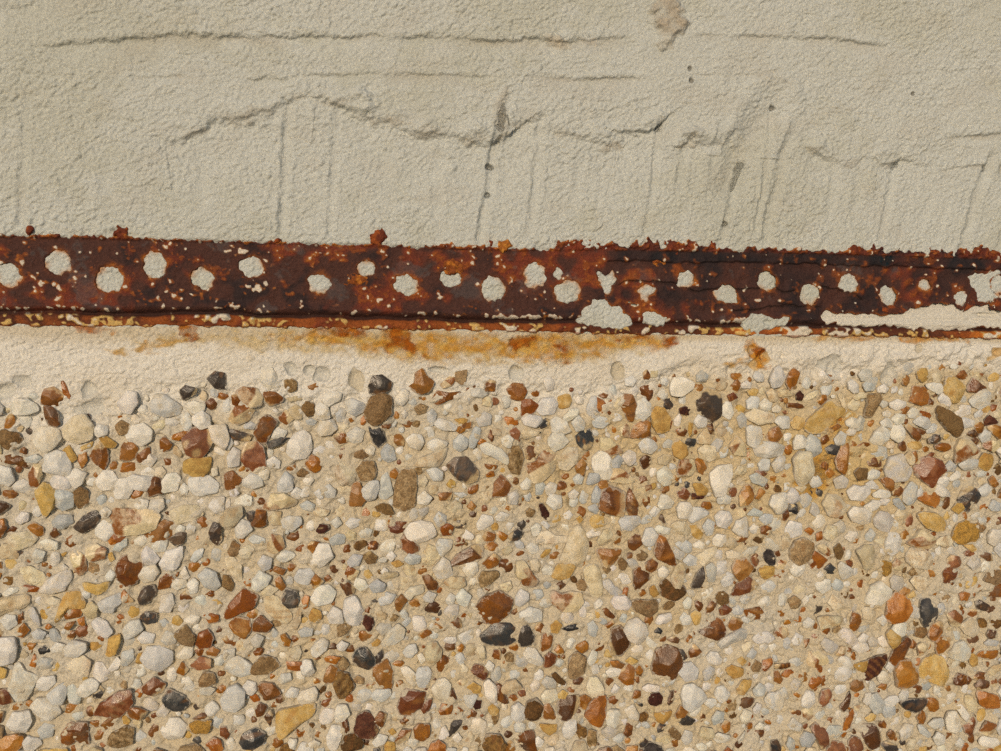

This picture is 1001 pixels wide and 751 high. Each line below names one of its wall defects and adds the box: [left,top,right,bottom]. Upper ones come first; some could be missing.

rust [0,225,337,245]
rust [353,228,1001,343]
rust [156,325,197,347]
rust [308,299,678,359]
rust [741,313,789,368]